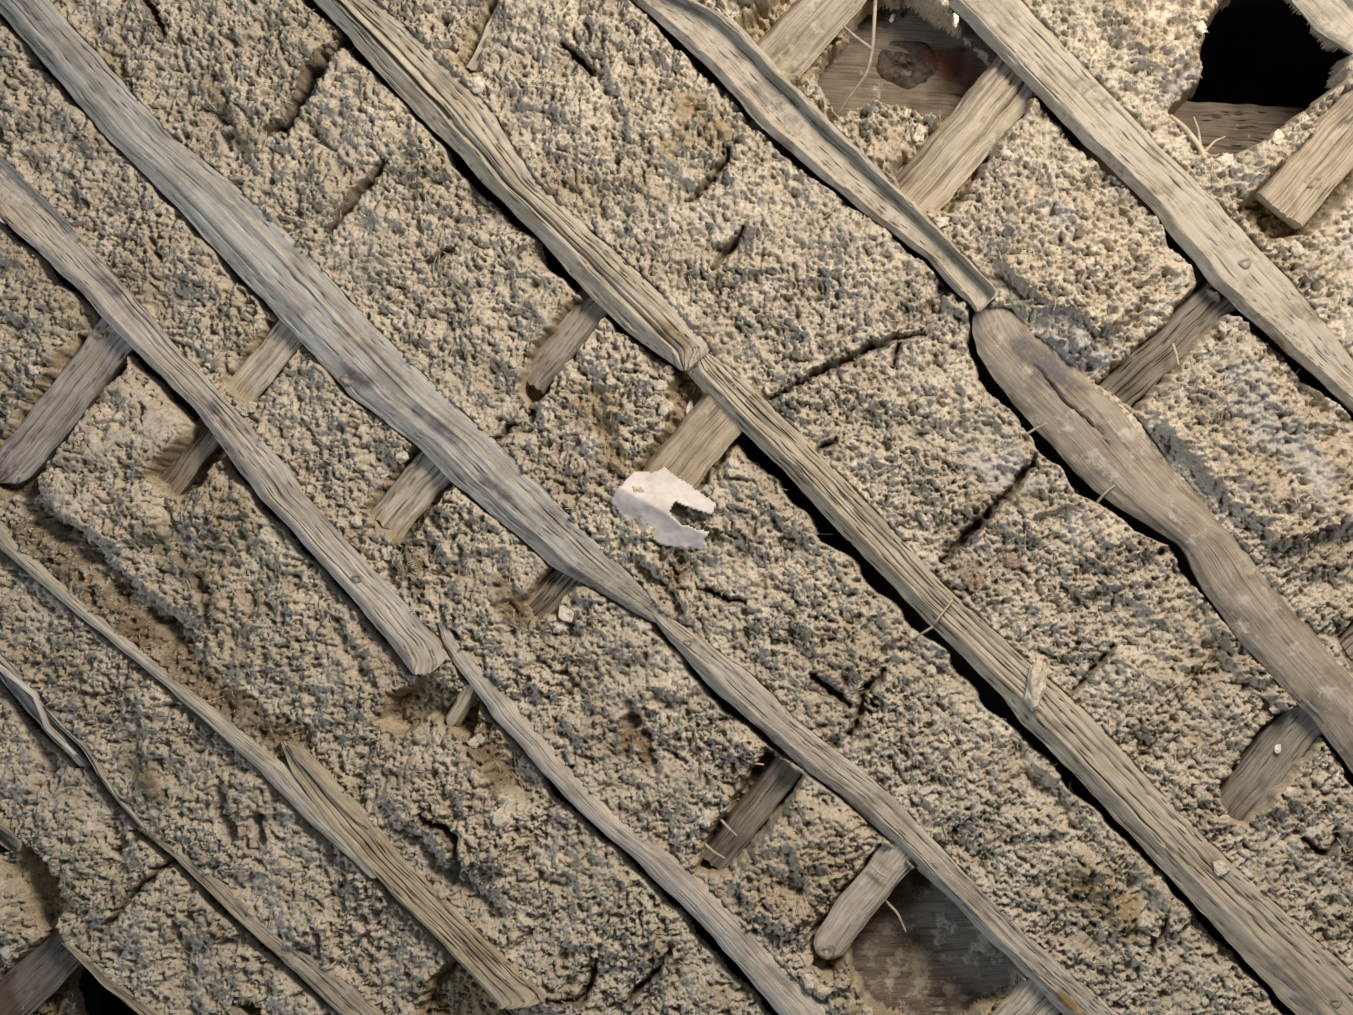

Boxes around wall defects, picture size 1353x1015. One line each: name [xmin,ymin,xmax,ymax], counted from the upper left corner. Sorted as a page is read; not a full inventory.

spalling [732,0,797,43]
spalling [780,0,1041,229]
spalling [1161,0,1353,257]
spalling [0,832,154,1015]
spalling [796,830,908,1015]
spalling [956,965,1027,1015]